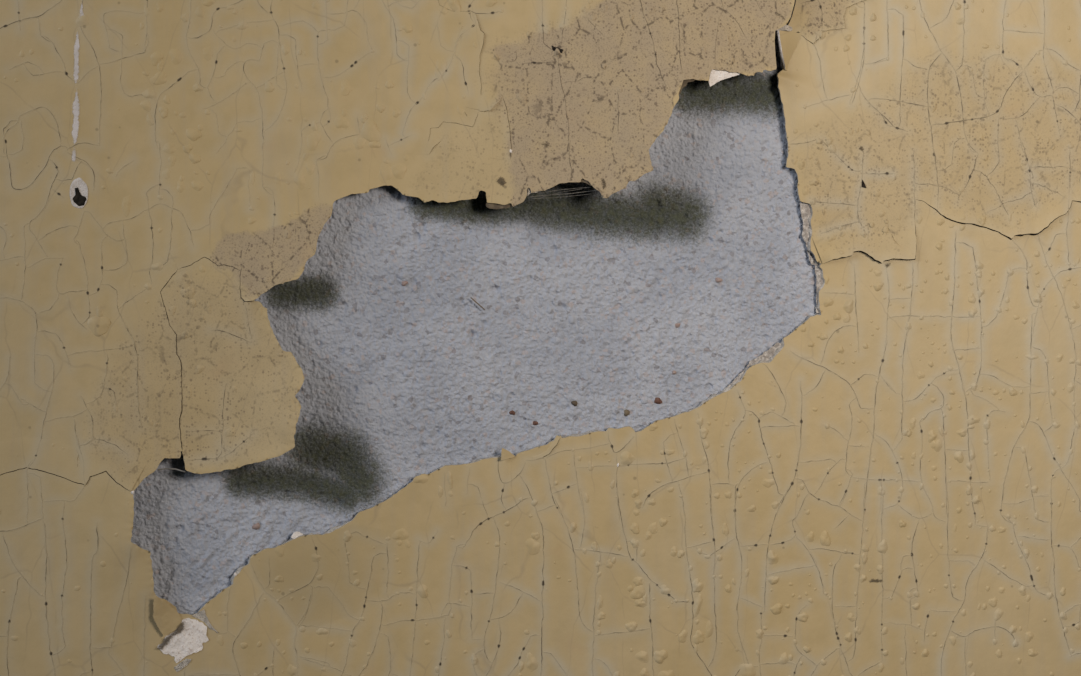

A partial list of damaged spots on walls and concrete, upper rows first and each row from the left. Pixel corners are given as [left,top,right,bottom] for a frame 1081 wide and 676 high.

crack [0,0,500,484]
peeling [131,0,917,672]
crack [298,0,1081,676]
crack [0,501,132,676]
crack [206,535,319,676]